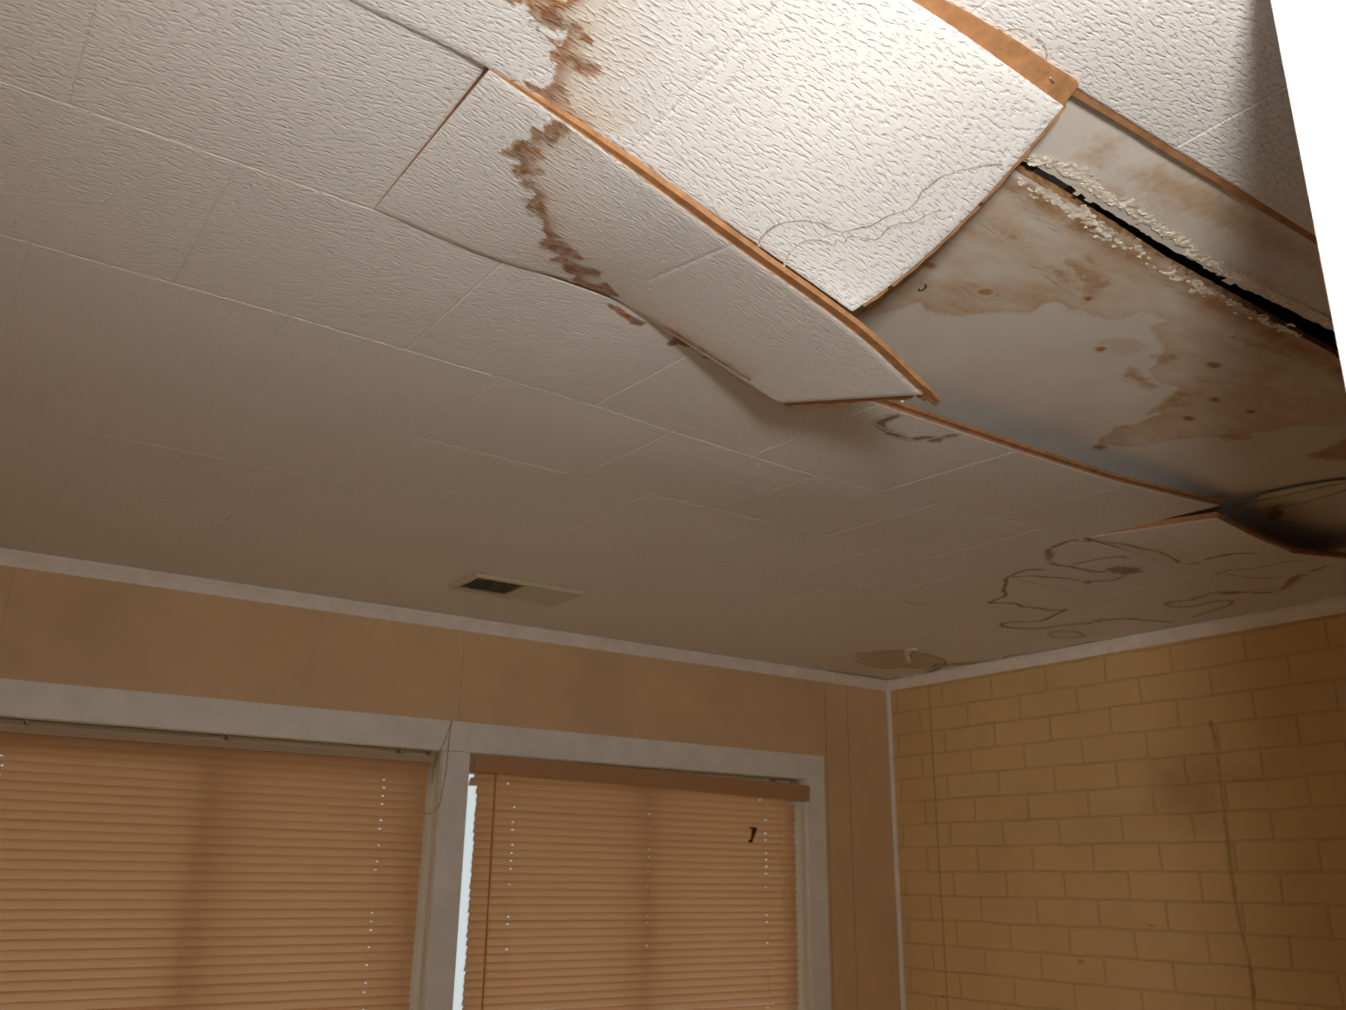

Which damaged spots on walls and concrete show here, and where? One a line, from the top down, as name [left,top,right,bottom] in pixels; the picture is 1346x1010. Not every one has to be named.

damp [497,0,773,382]
damp [757,127,1346,463]
peeling [1017,153,1333,338]
damp [851,539,1333,671]
crack [1207,718,1257,1010]